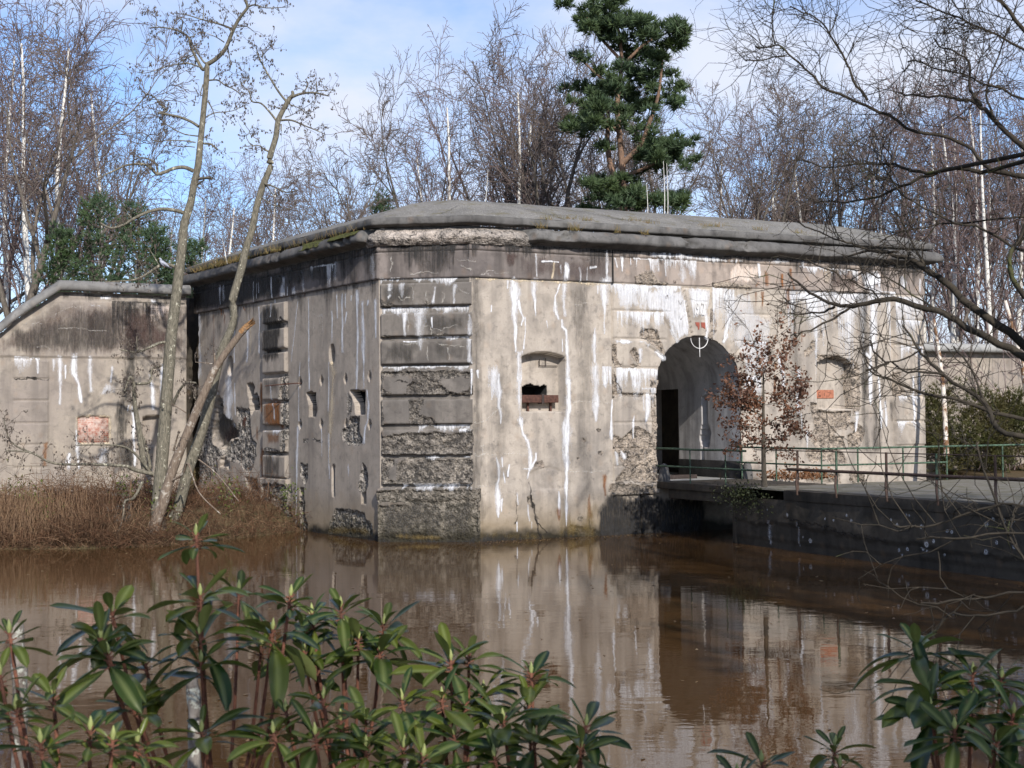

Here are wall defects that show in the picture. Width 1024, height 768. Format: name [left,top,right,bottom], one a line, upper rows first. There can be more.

efflorescence [53,355,92,404]
spalling [193,374,289,483]
spalling [328,369,481,542]
damp [65,243,923,537]
crack [515,419,547,536]
spalling [598,327,665,496]